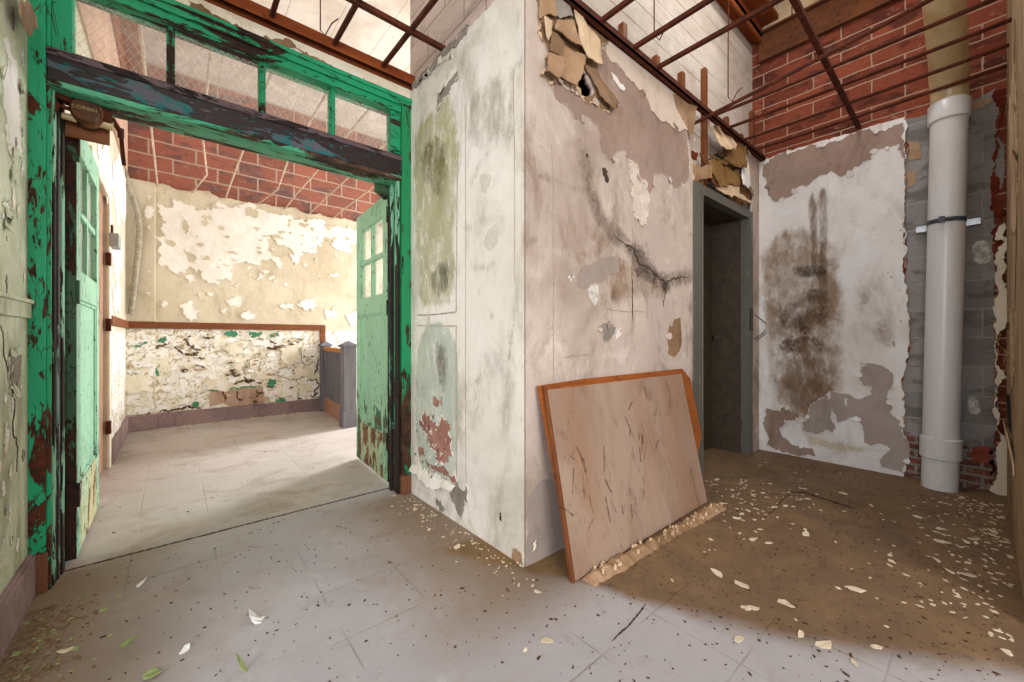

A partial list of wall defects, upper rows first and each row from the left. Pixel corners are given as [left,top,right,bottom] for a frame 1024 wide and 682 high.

peeling [0,347,25,553]
peeling [1,0,38,241]
peeling [111,195,357,438]
peeling [409,323,468,520]
crack [611,231,690,318]
peeling [536,0,930,479]
water stain [766,190,839,416]
flaking render [959,58,1018,490]